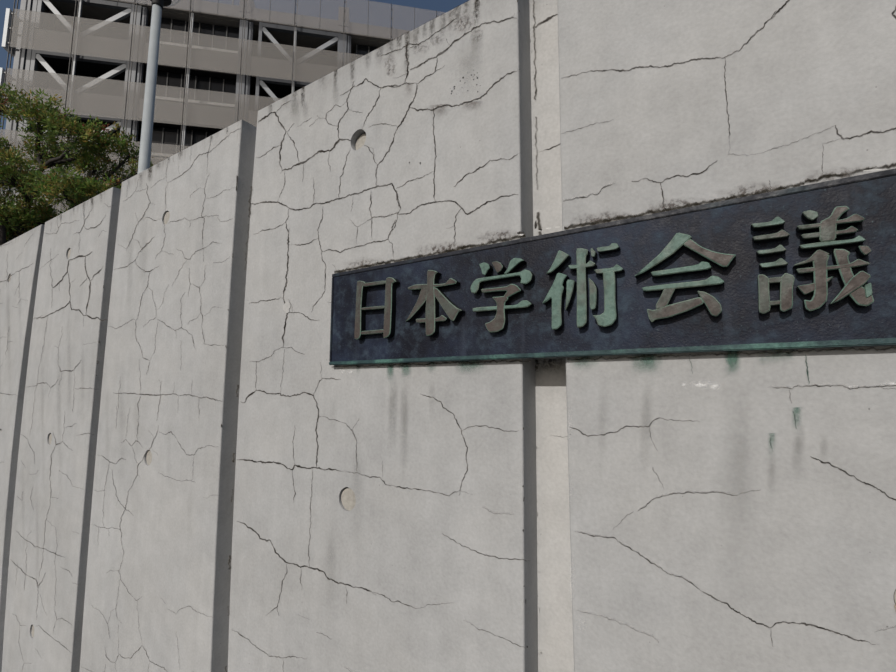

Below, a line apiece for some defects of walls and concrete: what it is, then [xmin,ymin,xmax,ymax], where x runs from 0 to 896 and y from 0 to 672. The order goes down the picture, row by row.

crack [563,0,789,136]
crack [767,125,896,171]
crack [568,161,717,209]
crack [238,17,524,614]
damp [727,351,738,368]
crack [0,130,236,672]
crack [558,417,691,437]
crack [774,362,896,426]
crack [810,456,896,500]
crack [579,470,889,645]